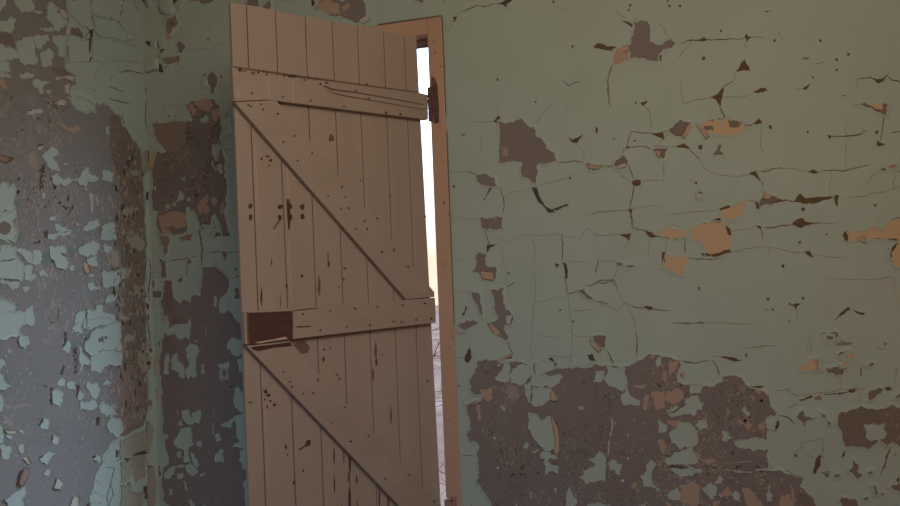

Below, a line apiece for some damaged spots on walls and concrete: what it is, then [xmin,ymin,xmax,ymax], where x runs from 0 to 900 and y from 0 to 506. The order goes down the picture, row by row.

peeling [309,0,369,26]
peeling [626,4,691,65]
peeling [473,115,560,190]
crack [323,0,900,366]
peeling [0,0,293,506]
peeling [451,249,517,344]
peeling [660,184,787,279]
peeling [842,215,900,271]
peeling [821,327,861,379]
peeling [458,332,819,506]
peeling [834,384,900,484]